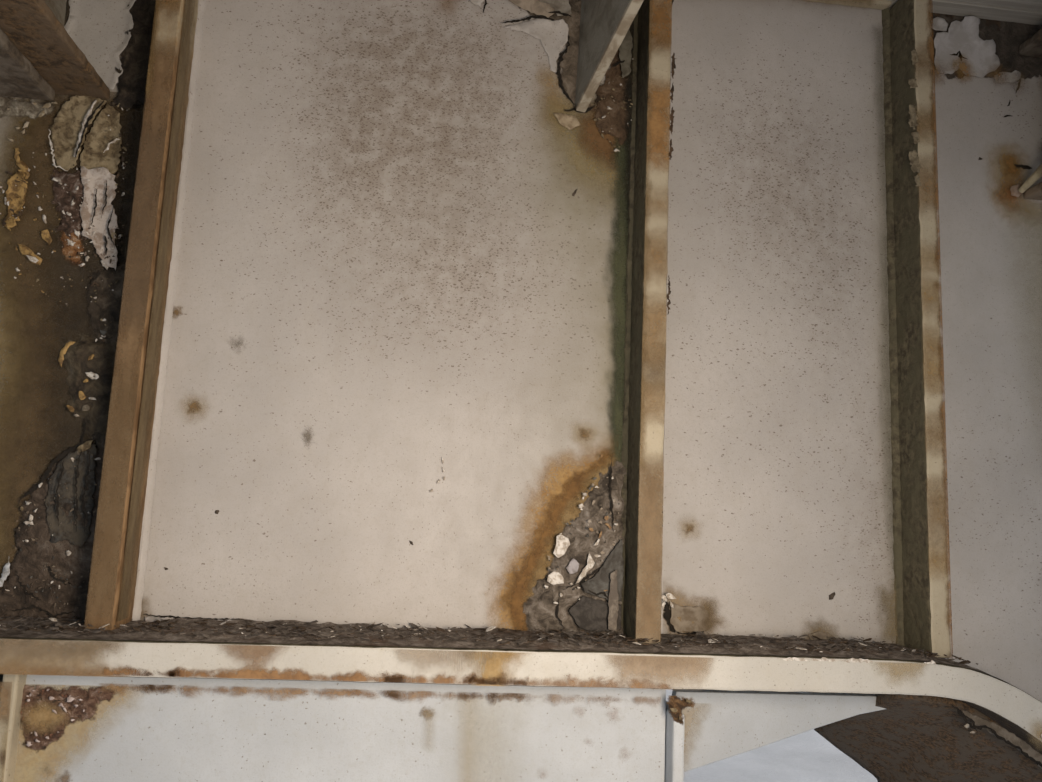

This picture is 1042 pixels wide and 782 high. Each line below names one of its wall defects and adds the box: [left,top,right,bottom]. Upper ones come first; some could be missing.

peeling [503,0,595,123]
peeling [931,13,1042,83]
peeling [0,0,157,288]
water stain [609,20,634,463]
rust [993,153,1032,214]
rust [496,0,714,642]
rust [0,639,706,782]
crack [951,704,1042,769]